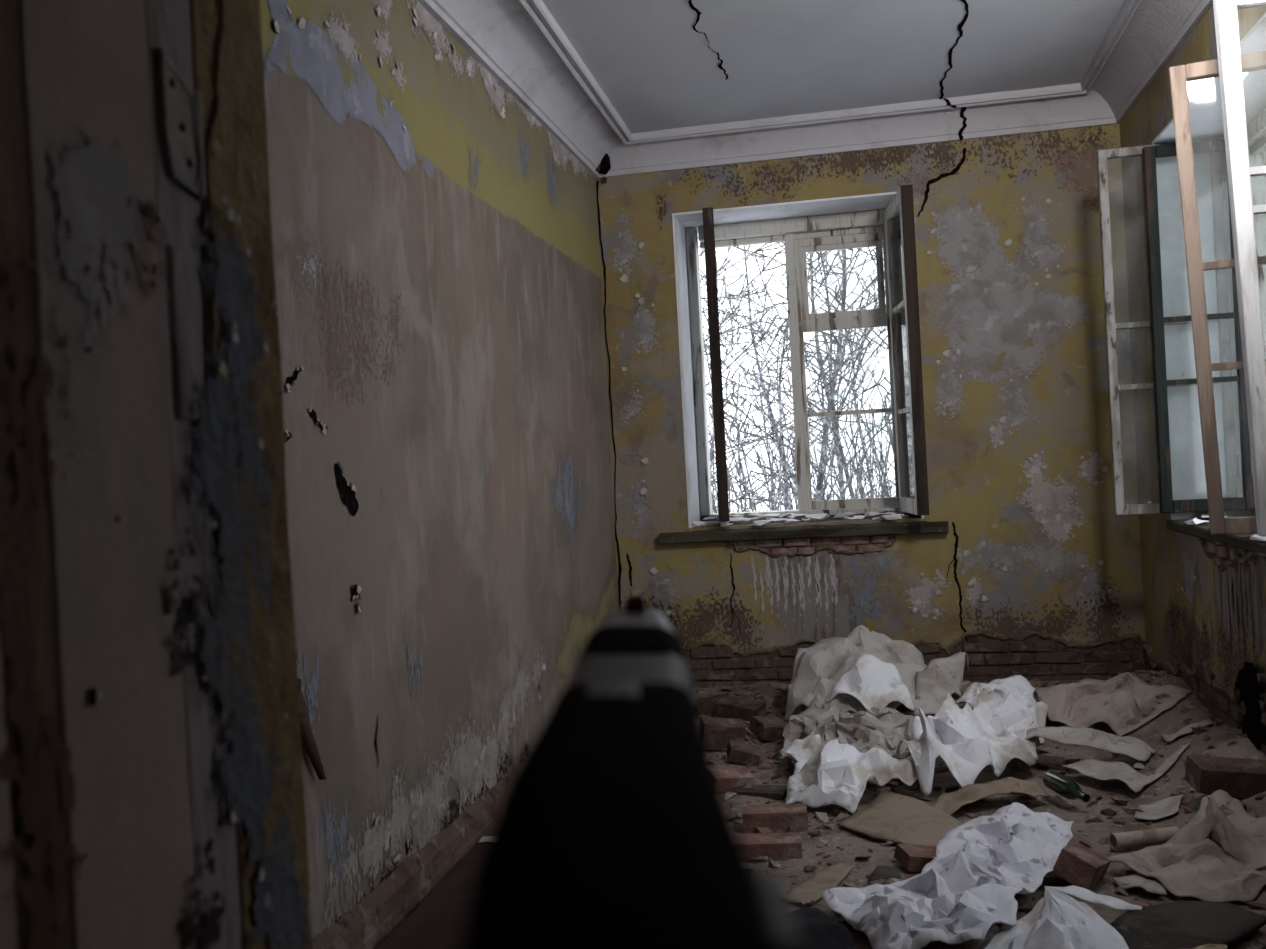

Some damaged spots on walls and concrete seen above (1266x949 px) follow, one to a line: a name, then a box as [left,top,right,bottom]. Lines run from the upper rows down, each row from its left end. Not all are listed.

crack [688,0,728,80]
peeling [264,0,611,211]
crack [917,0,969,217]
spalling [284,365,303,392]
peeling [727,188,1116,626]
spalling [335,462,359,516]
damp [621,550,864,650]
crack [946,522,967,643]
peeling [298,678,326,780]
peeling [313,549,617,930]
flaking render [683,639,818,688]
flaking render [912,630,1266,755]